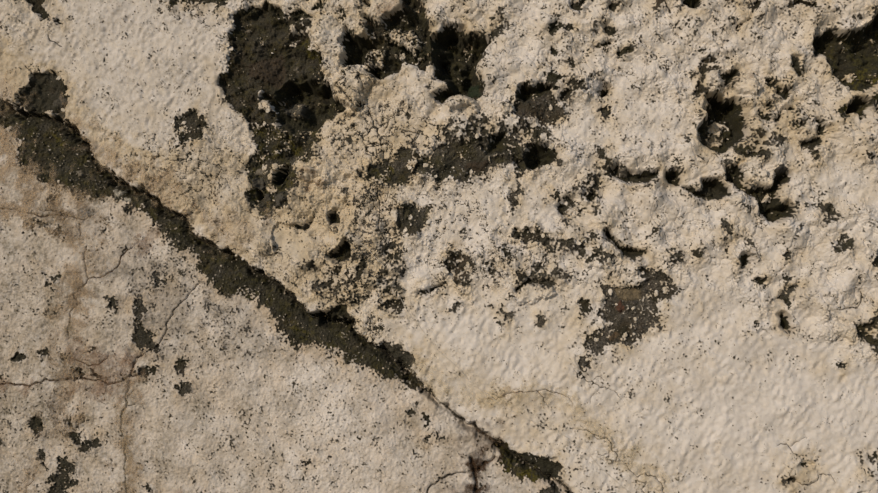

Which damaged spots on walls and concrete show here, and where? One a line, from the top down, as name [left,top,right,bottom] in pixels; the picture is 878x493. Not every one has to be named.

spalling [723,0,762,32]
spalling [791,56,805,77]
spalling [813,14,878,124]
spalling [549,54,795,222]
spalling [795,120,834,167]
peeling [0,0,707,397]
peeling [715,218,739,253]
peeling [804,196,843,228]
peeling [831,233,855,253]
crack [0,66,630,493]
spalling [777,281,800,332]
crack [576,429,664,493]